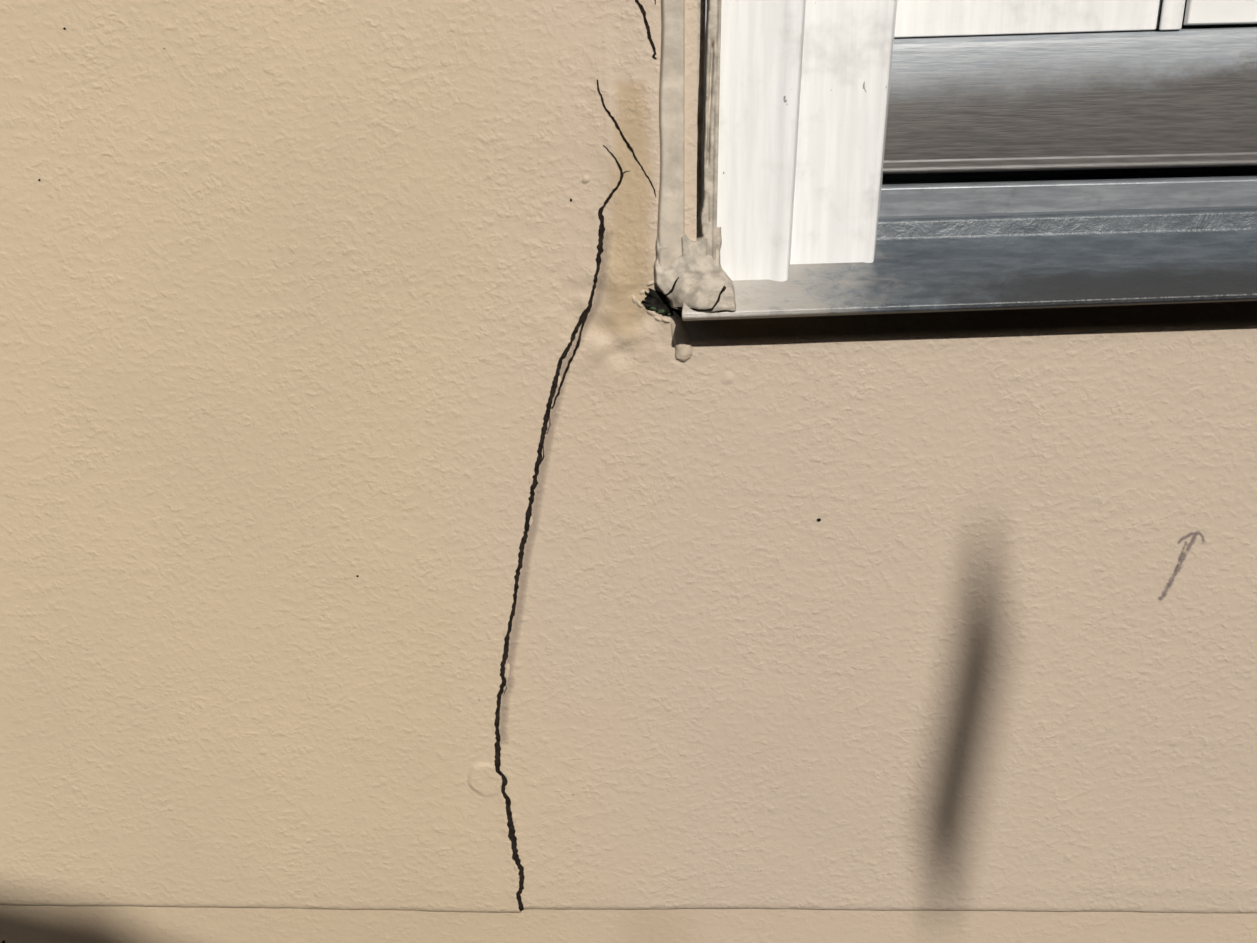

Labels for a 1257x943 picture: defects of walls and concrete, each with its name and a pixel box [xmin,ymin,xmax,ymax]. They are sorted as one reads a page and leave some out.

crack [491,79,656,911]